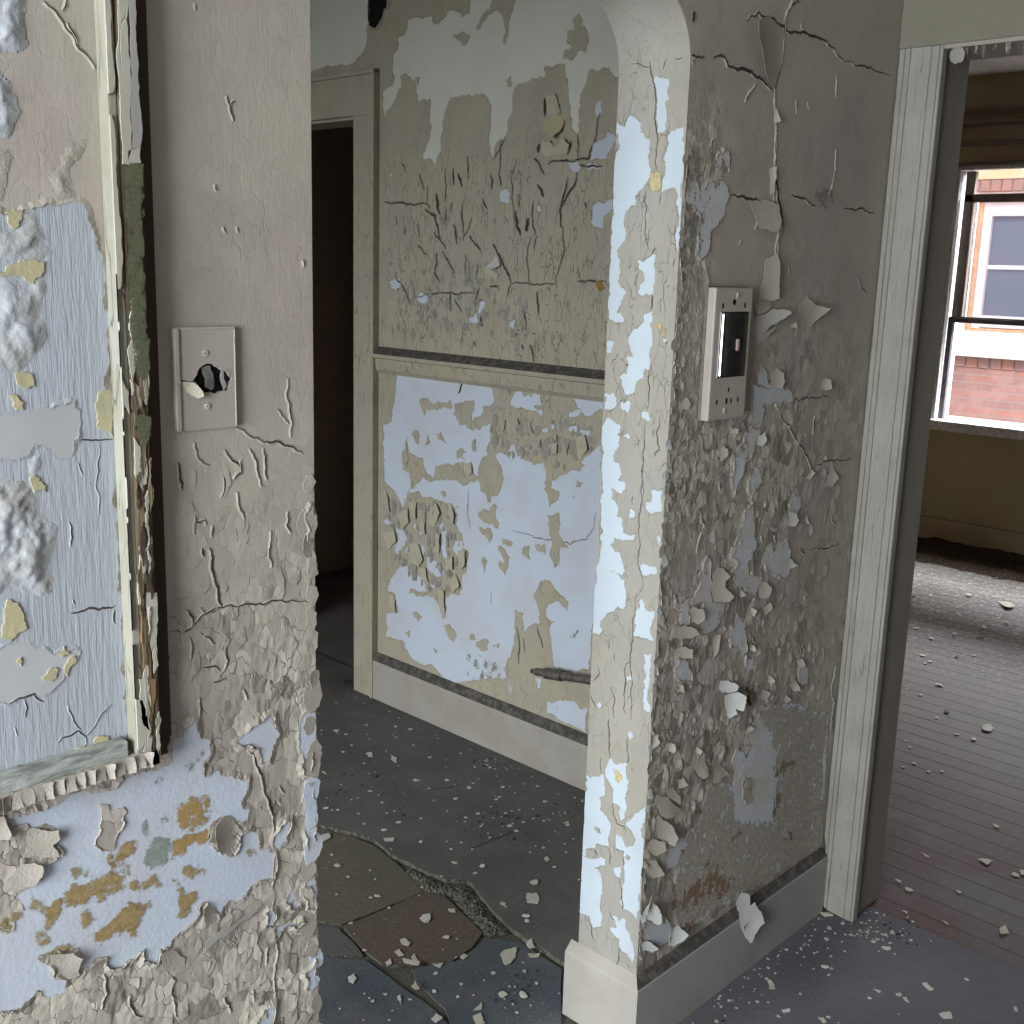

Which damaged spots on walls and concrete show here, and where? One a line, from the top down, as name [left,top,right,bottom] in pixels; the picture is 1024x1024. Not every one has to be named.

crack [384,97,606,362]
crack [630,0,891,275]
peeling [0,196,128,771]
peeling [0,464,323,1024]
crack [175,379,303,519]
crack [168,511,310,718]
crack [516,627,544,665]
crack [504,390,570,455]
peeling [381,0,840,965]
crack [100,973,142,1019]
crack [170,976,179,1020]
crack [223,744,286,1014]